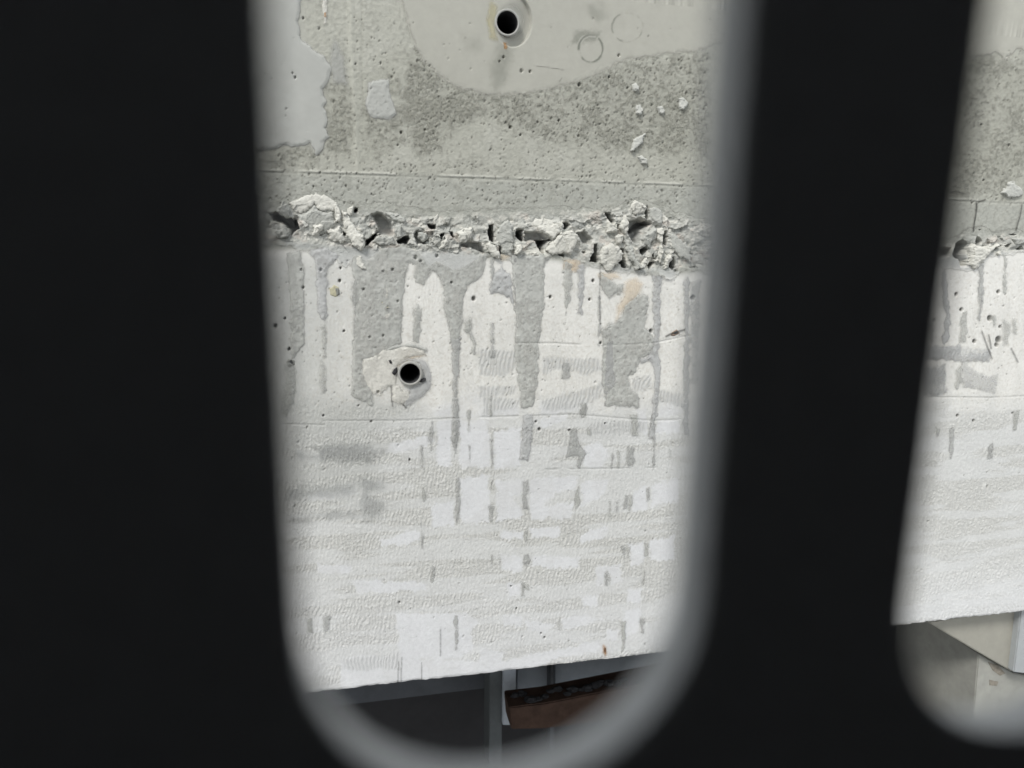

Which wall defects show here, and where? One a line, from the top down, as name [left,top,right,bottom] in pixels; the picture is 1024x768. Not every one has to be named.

water stain [287,248,338,357]
water stain [351,247,551,461]
water stain [563,261,584,315]
water stain [598,272,662,468]
water stain [566,404,591,468]